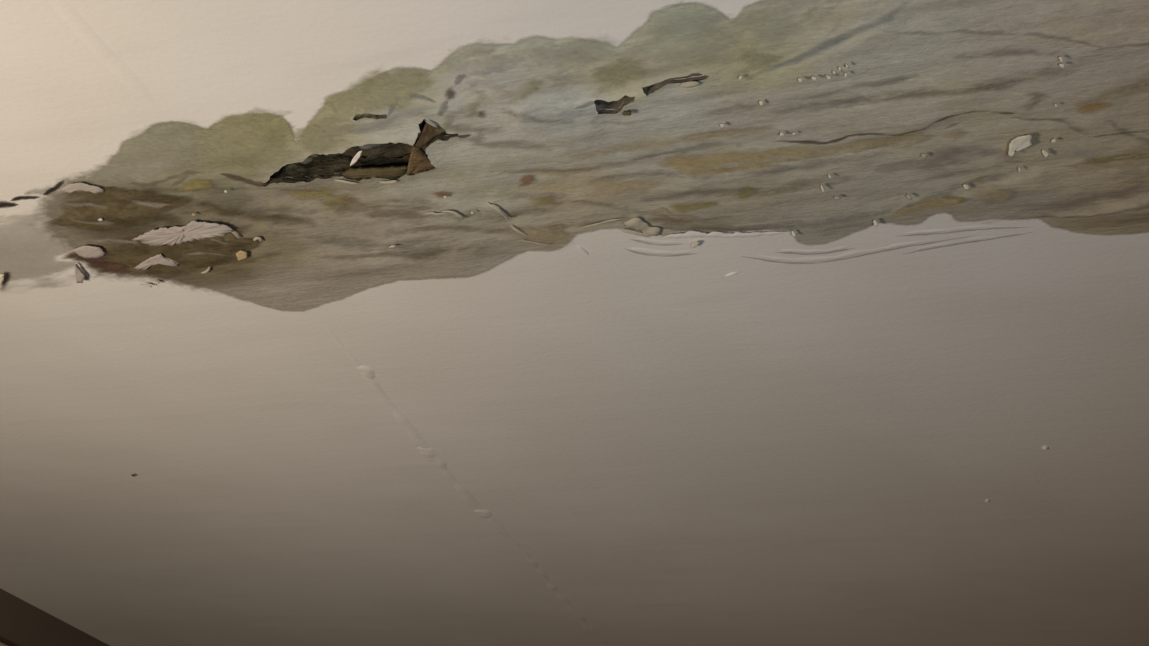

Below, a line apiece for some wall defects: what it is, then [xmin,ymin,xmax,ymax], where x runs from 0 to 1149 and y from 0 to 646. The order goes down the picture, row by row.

flaking render [219,75,470,193]
damp [44,0,1149,311]
flaking render [574,73,708,116]
peeling [51,182,300,284]